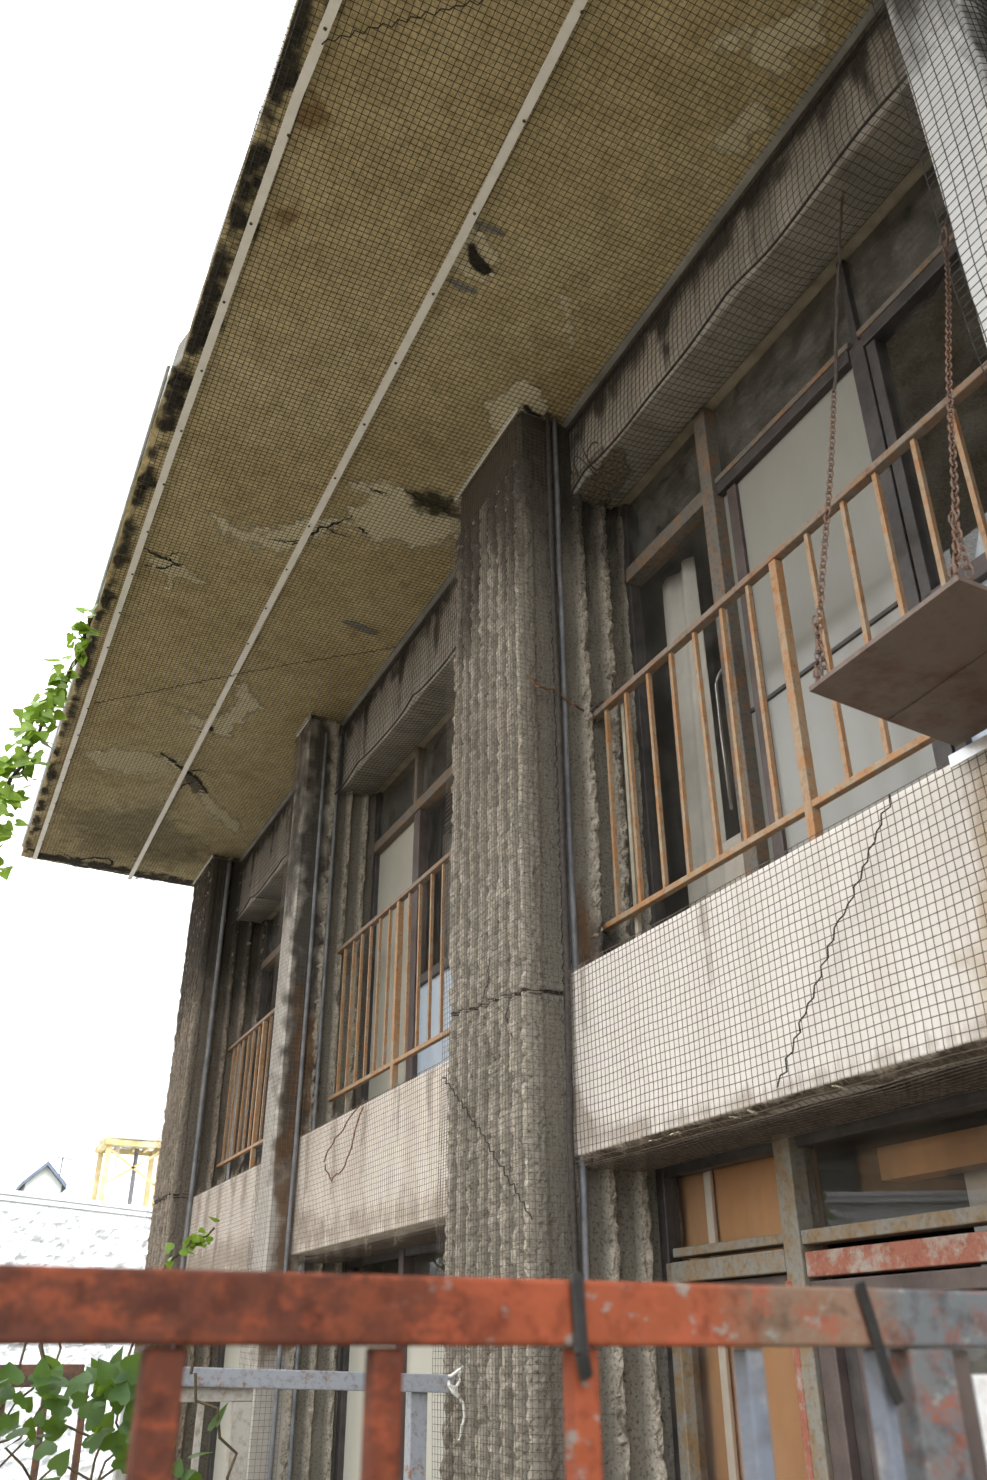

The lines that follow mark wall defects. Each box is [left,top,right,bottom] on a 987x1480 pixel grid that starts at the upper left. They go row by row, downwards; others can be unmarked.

efflorescence [710,0,828,75]
leakage [713,92,773,156]
spalling [448,221,505,294]
peeling [209,478,462,554]
crack [144,548,189,569]
leakage [24,157,787,1158]
crack [160,753,208,794]
crack [450,964,563,1038]